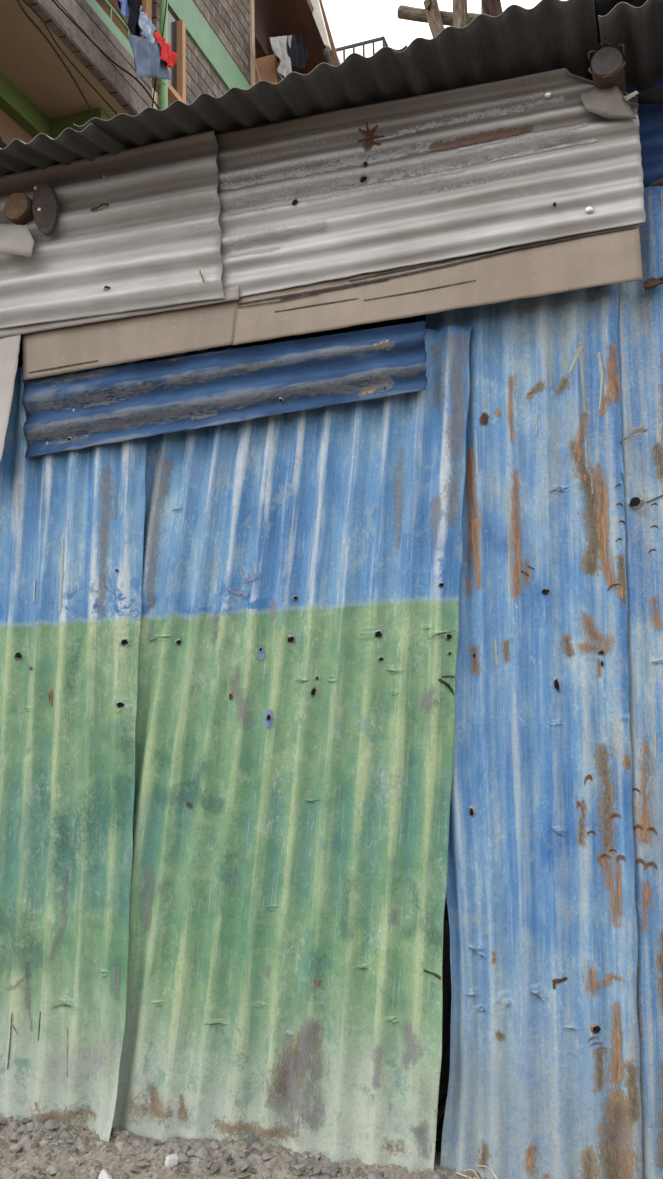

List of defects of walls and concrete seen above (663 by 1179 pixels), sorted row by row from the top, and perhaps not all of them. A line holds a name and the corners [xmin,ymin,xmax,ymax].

rust [430,125,533,151]
rust [507,469,531,600]
rust [479,372,573,442]
rust [568,343,626,607]
rust [651,384,663,493]
rust [575,735,655,927]
rust [580,880,663,1038]
rust [572,1000,663,1179]
rust [522,1142,549,1179]